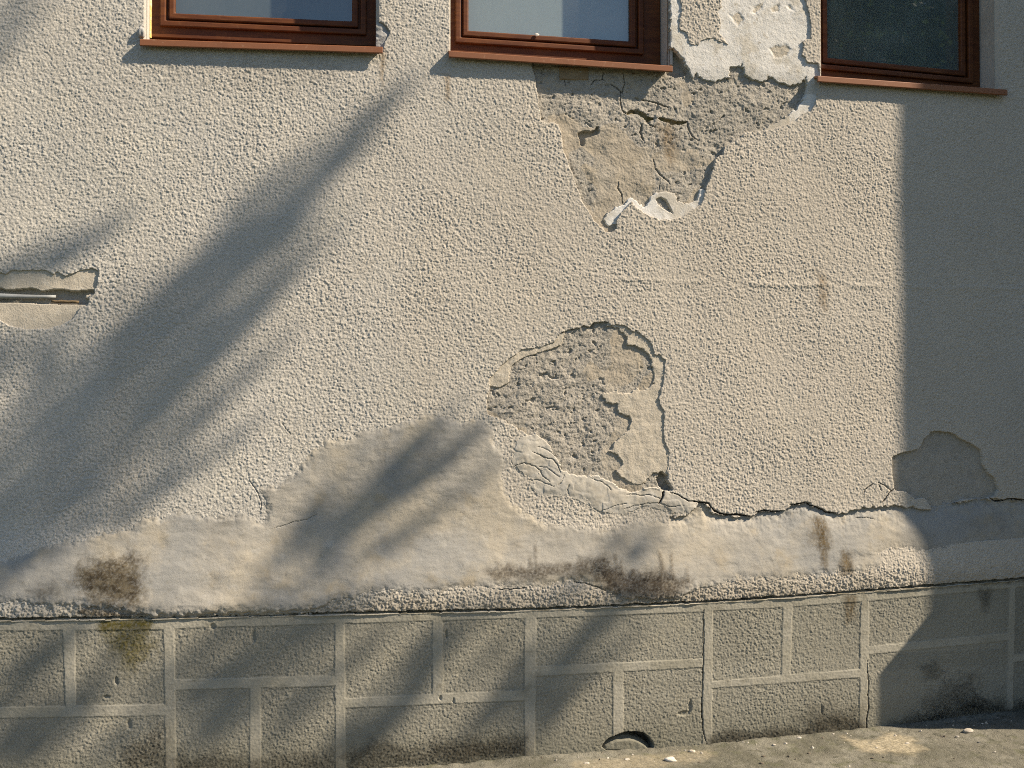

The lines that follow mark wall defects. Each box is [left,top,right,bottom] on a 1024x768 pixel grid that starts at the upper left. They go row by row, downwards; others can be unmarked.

spalling [532,0,819,232]
spalling [0,268,99,329]
spalling [487,321,698,515]
crack [608,482,893,518]
spalling [892,431,996,507]
leakage [78,553,152,662]
leakage [491,558,688,597]